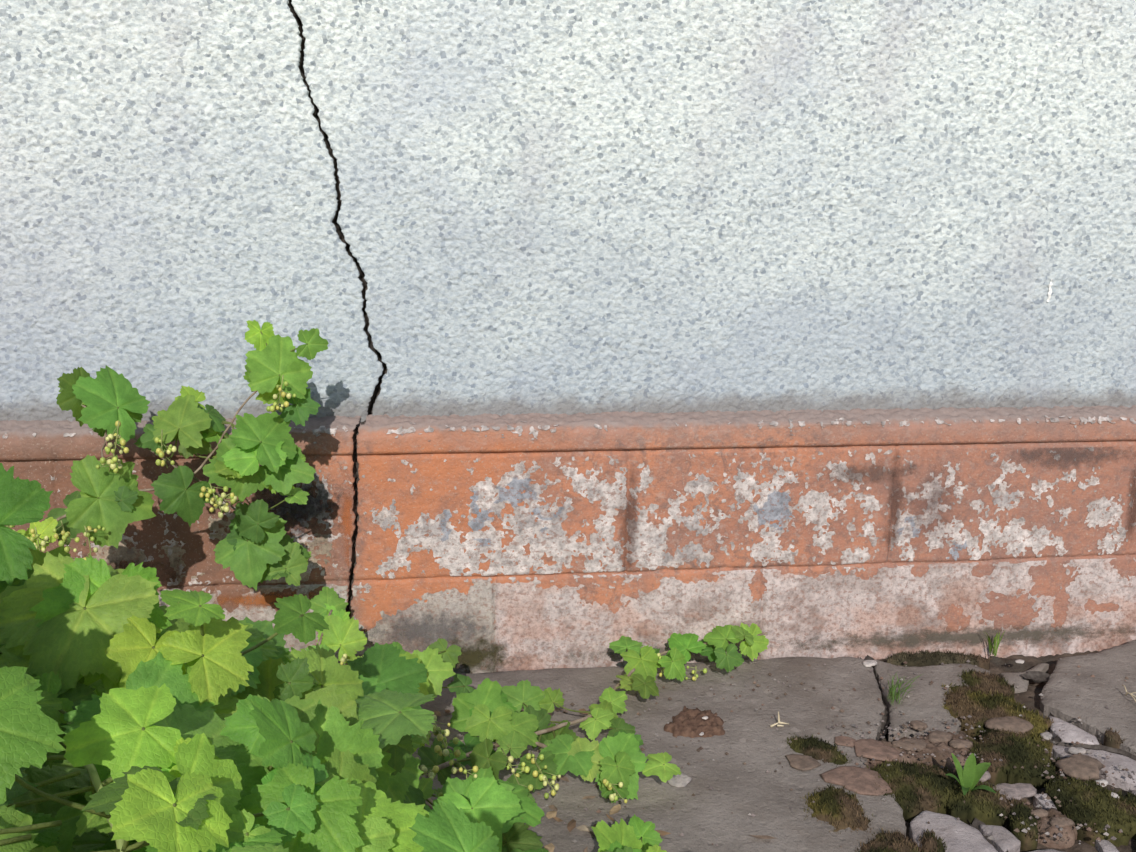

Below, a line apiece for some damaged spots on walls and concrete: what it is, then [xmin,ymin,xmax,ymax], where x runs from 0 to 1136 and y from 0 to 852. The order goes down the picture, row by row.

crack [288,0,387,618]
peeling [64,449,1136,674]